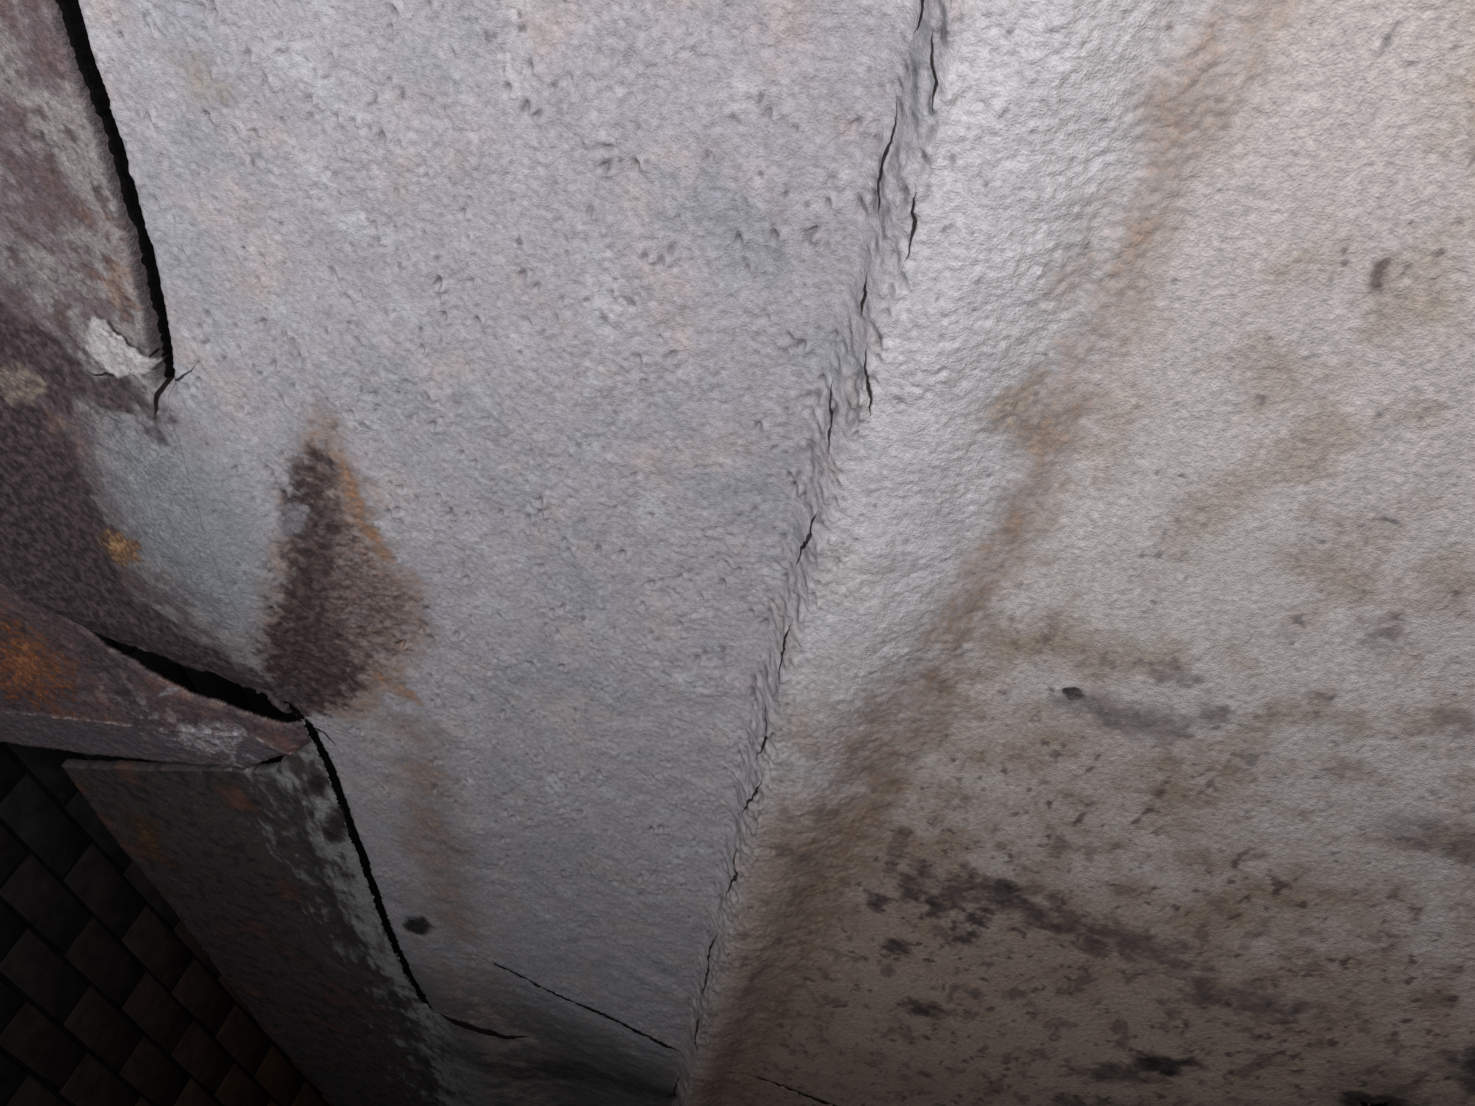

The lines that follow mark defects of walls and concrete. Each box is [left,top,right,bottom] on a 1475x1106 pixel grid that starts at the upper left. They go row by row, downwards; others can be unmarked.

crack [55,0,199,426]
crack [877,0,938,268]
crack [827,276,872,457]
crack [793,511,818,573]
crack [725,619,793,898]
leakage [1058,697,1185,739]
crack [283,701,528,1039]
crack [483,933,718,1106]
crack [753,1076,836,1106]